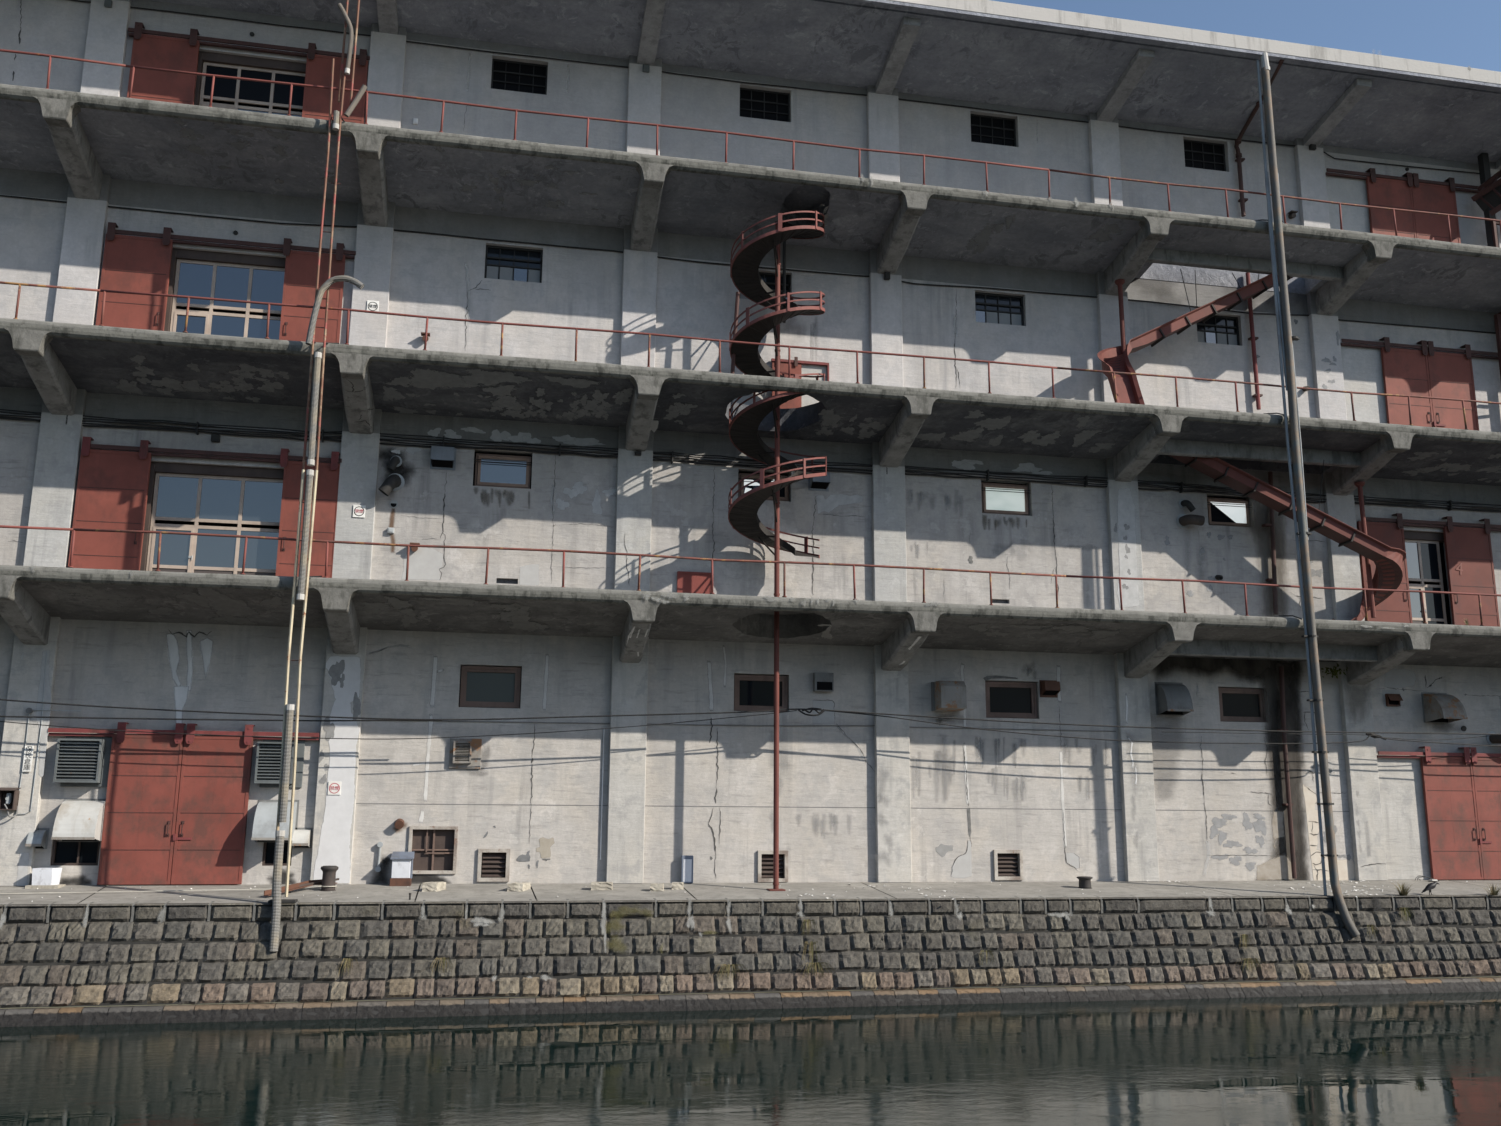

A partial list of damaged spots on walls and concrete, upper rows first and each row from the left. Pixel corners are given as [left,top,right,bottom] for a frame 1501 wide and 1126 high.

crack [707,646,727,876]
damp [1156,657,1307,881]
peeling [1210,762,1397,897]